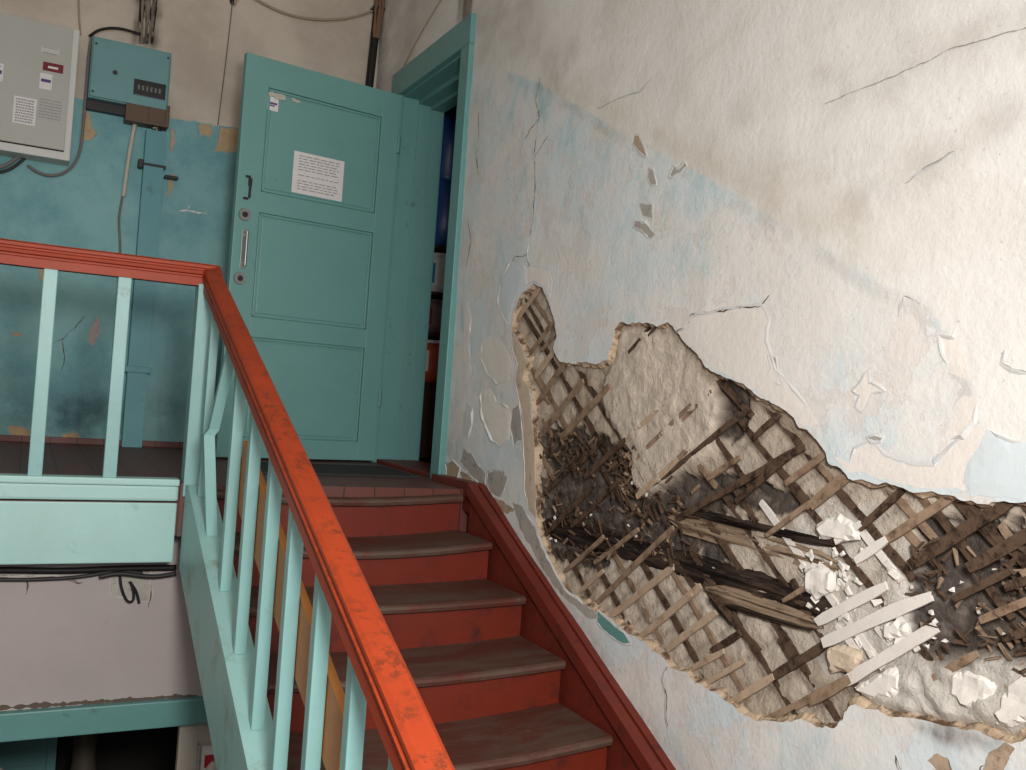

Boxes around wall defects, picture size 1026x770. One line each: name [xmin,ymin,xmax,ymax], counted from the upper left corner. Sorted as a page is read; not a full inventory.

crack [825,27,1026,104]
peeling [79,109,98,142]
peeling [197,123,239,154]
crack [513,79,546,266]
peeling [632,133,688,188]
crack [905,151,954,183]
peeling [633,202,656,241]
crack [999,349,1026,375]
flaking render [445,283,1026,770]